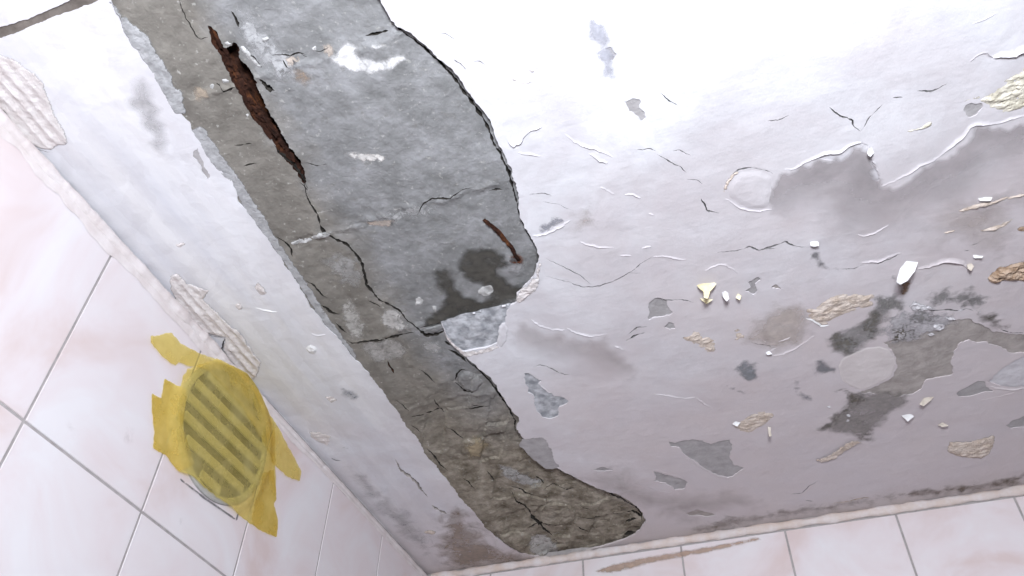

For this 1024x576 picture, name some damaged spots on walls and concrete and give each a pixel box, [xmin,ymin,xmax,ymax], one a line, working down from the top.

crack [831,84,946,131]
crack [366,27,650,287]
crack [637,148,773,213]
spalling [109,0,646,556]
water stain [426,249,522,326]
peeling [697,263,760,304]
peeling [861,252,983,285]
flaking render [988,262,1024,284]
crack [236,143,642,540]
water stain [831,292,980,354]
water stain [821,392,905,435]
peeling [669,439,743,477]